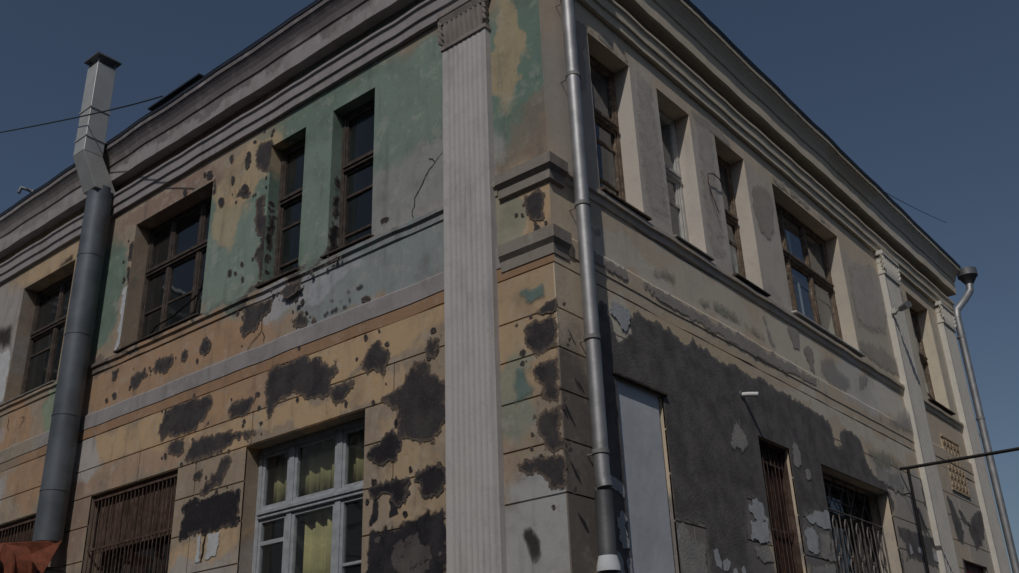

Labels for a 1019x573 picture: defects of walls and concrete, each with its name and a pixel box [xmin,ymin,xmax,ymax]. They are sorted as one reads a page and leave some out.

crack [412,153,442,217]
flaking render [203,128,342,347]
flaking render [158,346,355,506]
flaking render [355,327,445,466]
flaking render [515,297,578,494]
peeling [731,420,748,452]
flaking render [365,461,446,517]
peeling [391,532,442,573]
peeling [677,522,746,573]
peeling [749,498,774,563]
peeling [804,510,837,573]